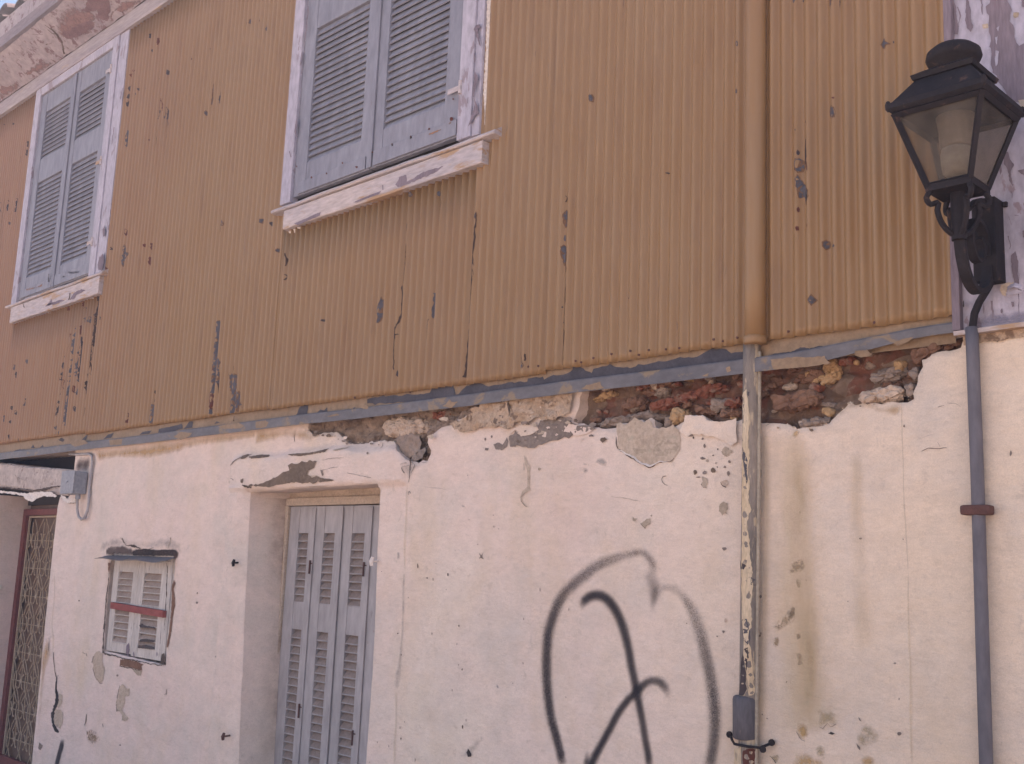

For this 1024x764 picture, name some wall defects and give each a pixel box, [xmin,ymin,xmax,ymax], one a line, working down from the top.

peeling [62,0,111,39]
peeling [953,0,1024,107]
peeling [794,139,809,202]
peeling [999,152,1024,193]
peeling [98,226,129,271]
peeling [1000,215,1024,310]
peeling [46,289,92,442]
peeling [140,391,193,440]
peeling [208,320,242,424]
spalling [230,336,966,696]
crack [38,646,63,750]
peeling [84,624,165,721]